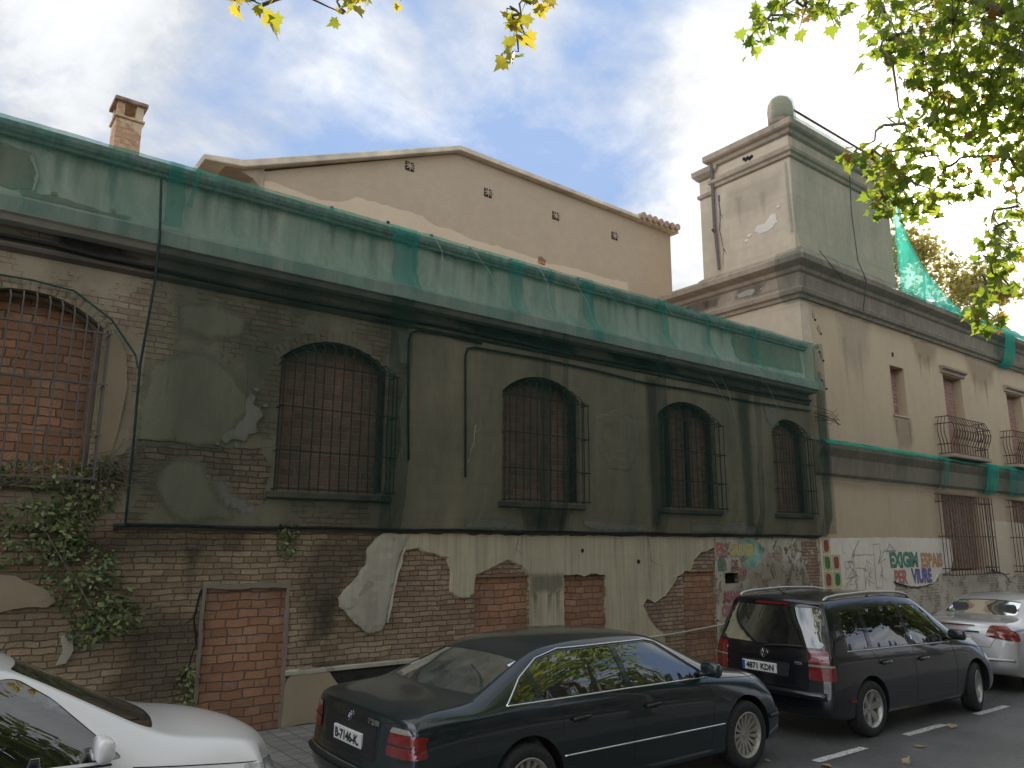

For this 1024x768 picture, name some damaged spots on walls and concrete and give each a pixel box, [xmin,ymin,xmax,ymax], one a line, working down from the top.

flaking render [745,205,780,242]
peeling [215,387,268,448]
flaking render [0,575,55,612]
flaking render [338,533,529,653]
flaking render [643,547,715,631]